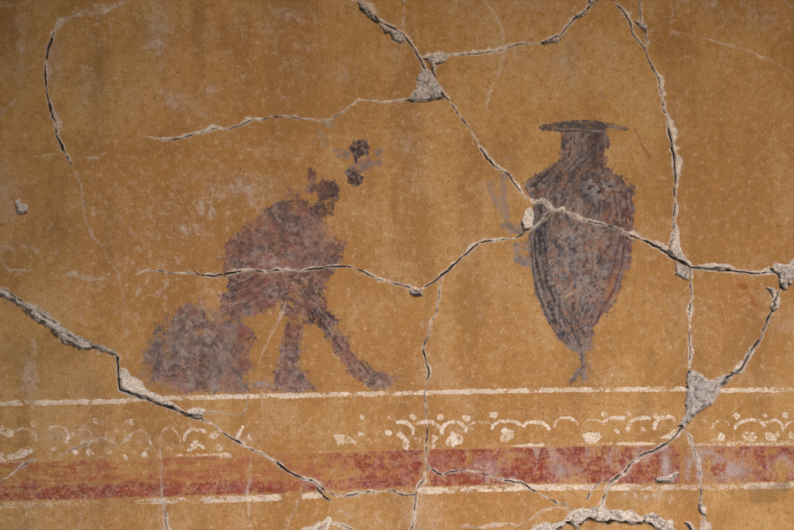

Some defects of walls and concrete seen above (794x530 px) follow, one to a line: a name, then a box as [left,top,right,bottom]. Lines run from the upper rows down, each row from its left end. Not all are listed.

spalling [406,54,448,103]
crack [43,0,132,349]
crack [129,0,683,530]
spalling [0,286,118,356]
crack [686,259,776,378]
crack [113,354,183,414]
spalling [119,367,207,418]
spalling [677,360,744,429]
crack [0,431,135,482]
crack [585,427,704,505]
spalling [530,505,696,530]
crack [699,515,712,530]